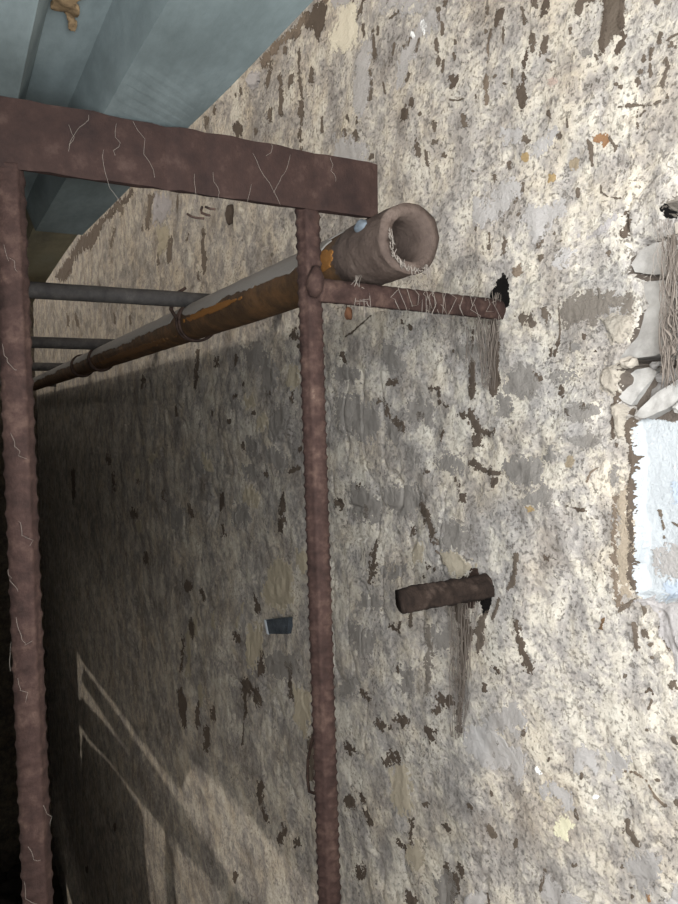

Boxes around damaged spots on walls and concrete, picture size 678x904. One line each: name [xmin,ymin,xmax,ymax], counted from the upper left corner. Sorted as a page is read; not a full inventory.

spalling [628,255,678,282]
spalling [630,302,648,343]
spalling [616,356,678,604]